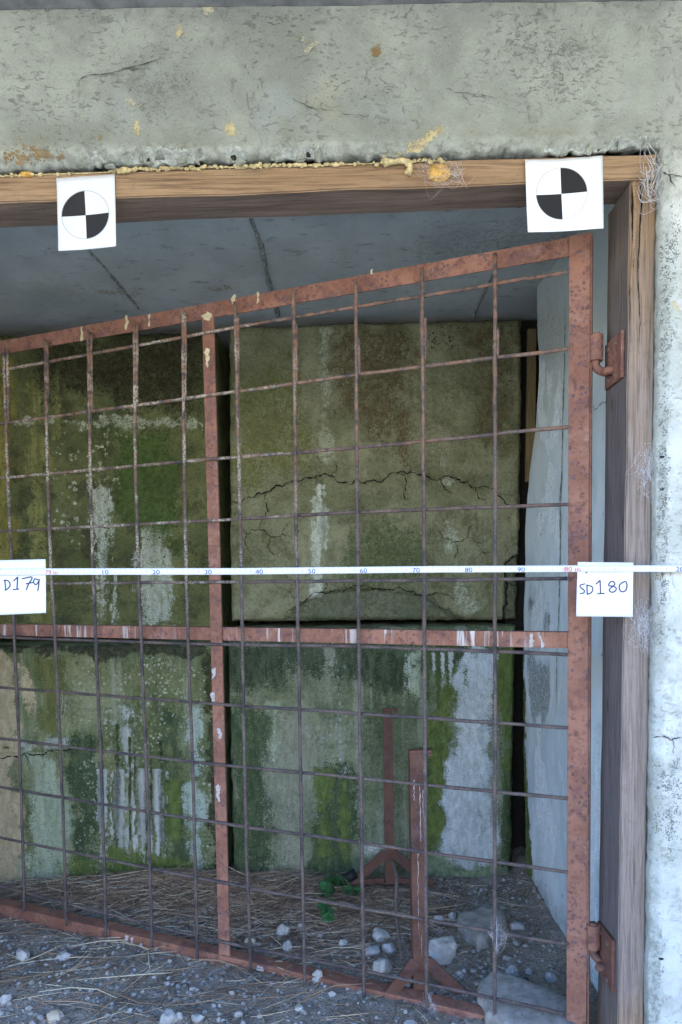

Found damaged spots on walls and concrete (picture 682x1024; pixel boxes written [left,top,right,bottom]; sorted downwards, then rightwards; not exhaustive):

corrosion [3,136,64,166]
leakage [15,333,218,442]
leakage [315,323,421,477]
leakage [457,320,521,453]
leakage [88,486,118,625]
efflorescence [308,483,330,599]
crack [285,583,458,616]
crack [235,464,509,554]
efflorescence [449,582,482,616]
crack [436,526,518,617]
leakage [0,641,489,882]